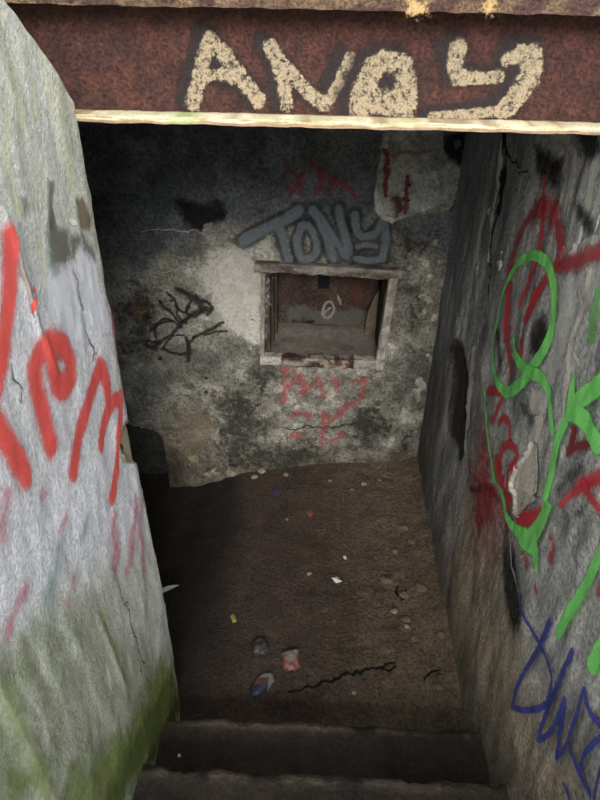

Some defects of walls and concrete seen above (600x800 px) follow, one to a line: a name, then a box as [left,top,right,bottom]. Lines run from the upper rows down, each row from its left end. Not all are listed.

crack [488,132,528,298]
crack [282,421,366,436]
spalling [508,385,548,518]
crack [113,568,151,687]
crack [288,661,396,693]